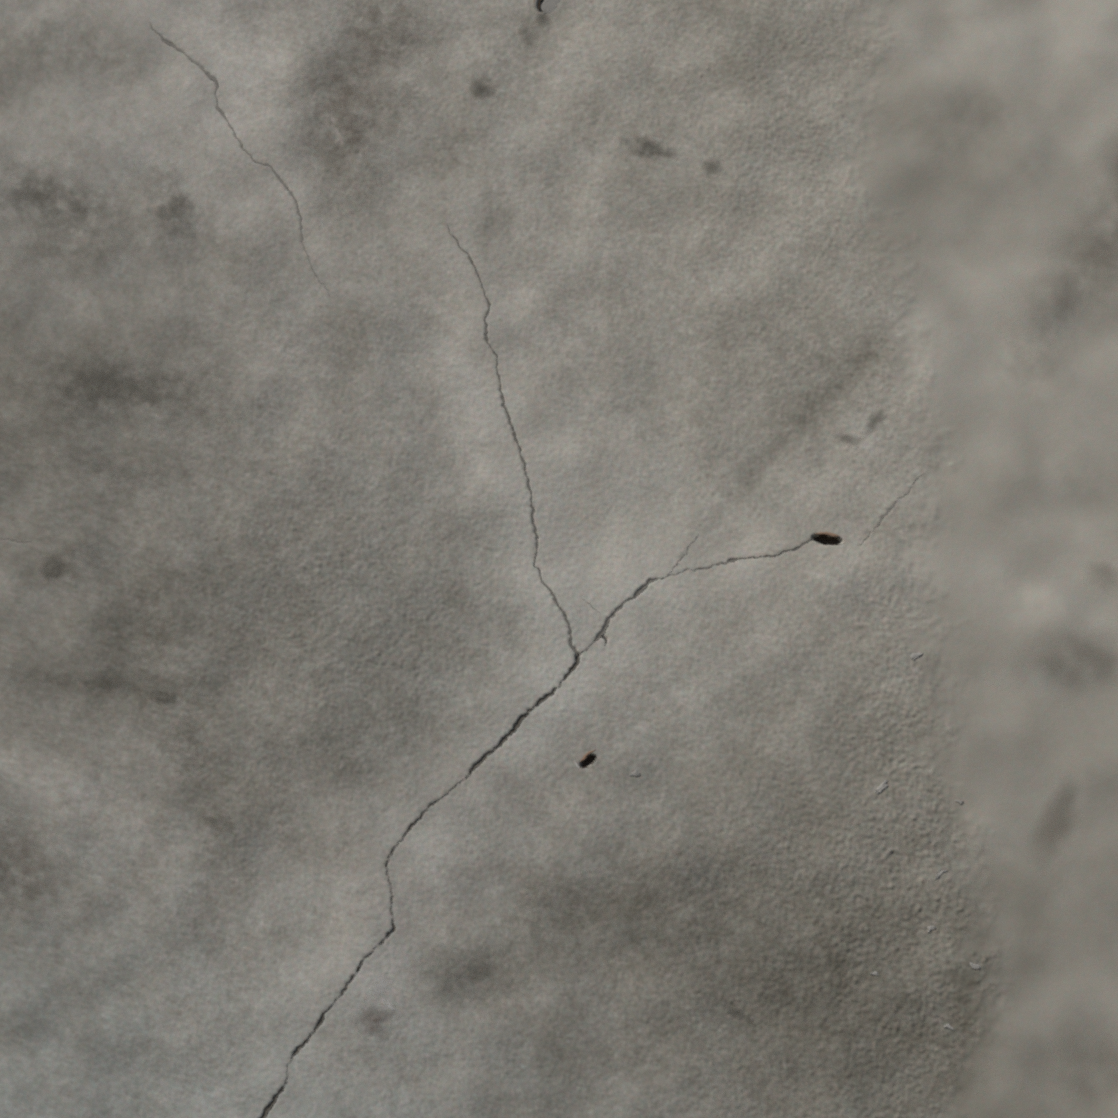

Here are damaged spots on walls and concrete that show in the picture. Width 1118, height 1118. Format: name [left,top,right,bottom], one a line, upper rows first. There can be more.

crack [151,26,325,287]
crack [863,476,920,542]
crack [261,225,814,1118]